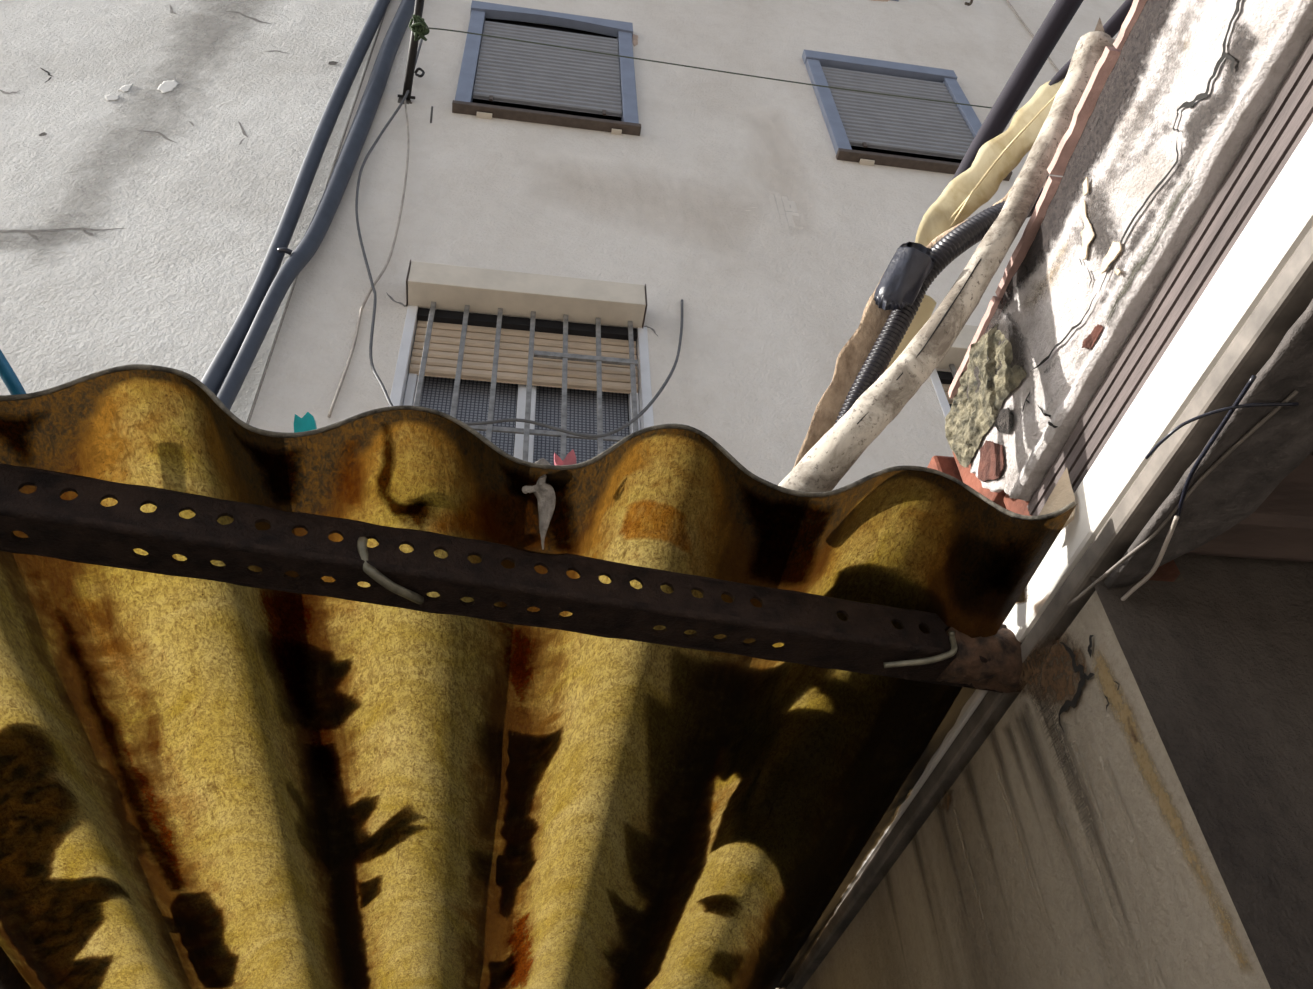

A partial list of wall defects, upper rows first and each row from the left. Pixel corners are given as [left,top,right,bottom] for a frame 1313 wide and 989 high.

peeling [1080,177,1122,276]
leakage [984,0,1257,334]
crack [1022,0,1241,428]
spalling [1082,324,1104,349]
spalling [978,408,1014,482]
corrosion [260,590,339,788]
crack [1059,635,1120,732]